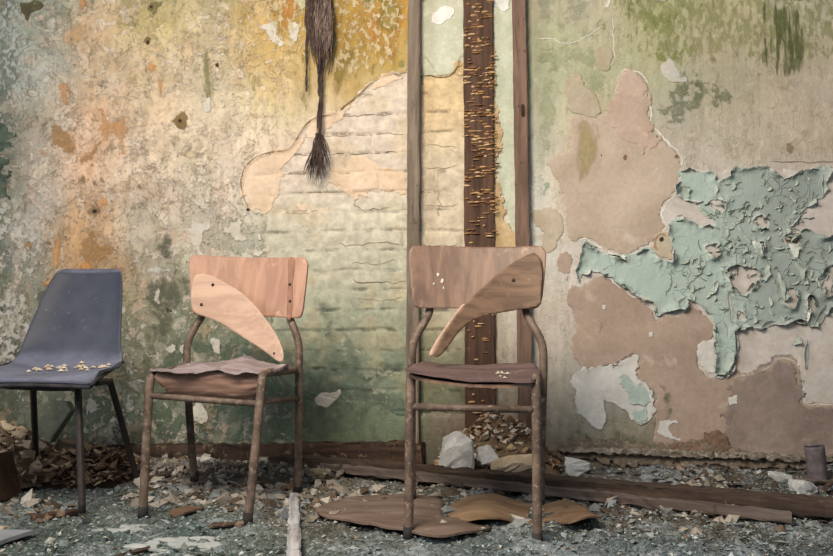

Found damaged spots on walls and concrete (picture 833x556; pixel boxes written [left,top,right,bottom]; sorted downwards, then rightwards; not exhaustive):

spalling [19,0,44,20]
peeling [259,21,300,47]
spalling [0,123,17,200]
water stain [172,112,187,129]
spalling [420,0,465,247]
peeling [493,0,516,247]
water stain [146,236,186,334]
spalling [223,71,407,416]
peeling [532,68,833,471]
peeling [210,338,220,354]
spalling [420,308,465,364]
peeling [193,403,208,424]